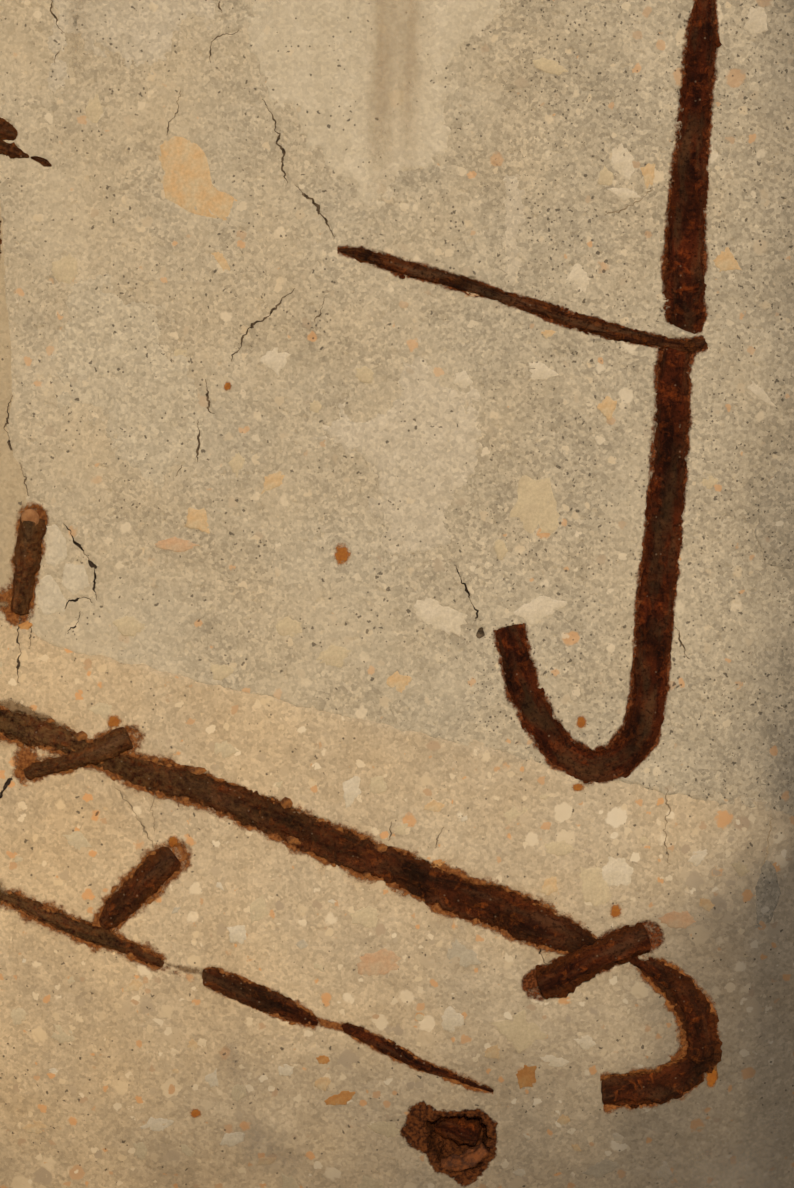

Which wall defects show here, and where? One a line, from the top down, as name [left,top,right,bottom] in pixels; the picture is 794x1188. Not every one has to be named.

crack [209,1,239,62]
crack [262,99,335,237]
corrosion [660,0,697,290]
corrosion [706,0,720,167]
corrosion [0,503,48,626]
corrosion [335,245,708,752]
crack [0,777,13,798]
corrosion [0,715,569,1001]
corrosion [493,628,661,791]
corrosion [330,823,718,1081]
corrosion [400,1101,498,1187]
corrosion [603,1069,717,1113]